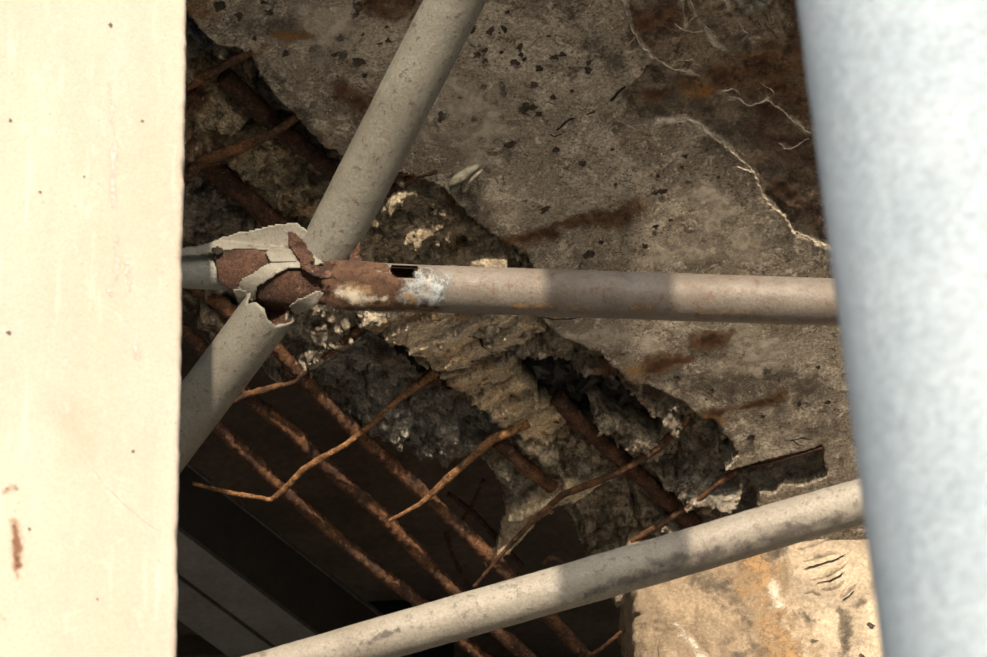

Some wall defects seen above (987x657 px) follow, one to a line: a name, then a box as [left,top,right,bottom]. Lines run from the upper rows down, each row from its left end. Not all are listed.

crack [617,0,698,75]
crack [675,0,748,53]
spalling [182,15,344,255]
peeling [620,0,829,249]
crack [721,83,812,150]
spalling [359,176,533,268]
corrosion [499,201,646,245]
spalling [181,245,324,342]
spalling [262,291,828,558]
corrosion [698,388,788,424]
corrosion [13,520,22,571]
crack [805,554,854,600]